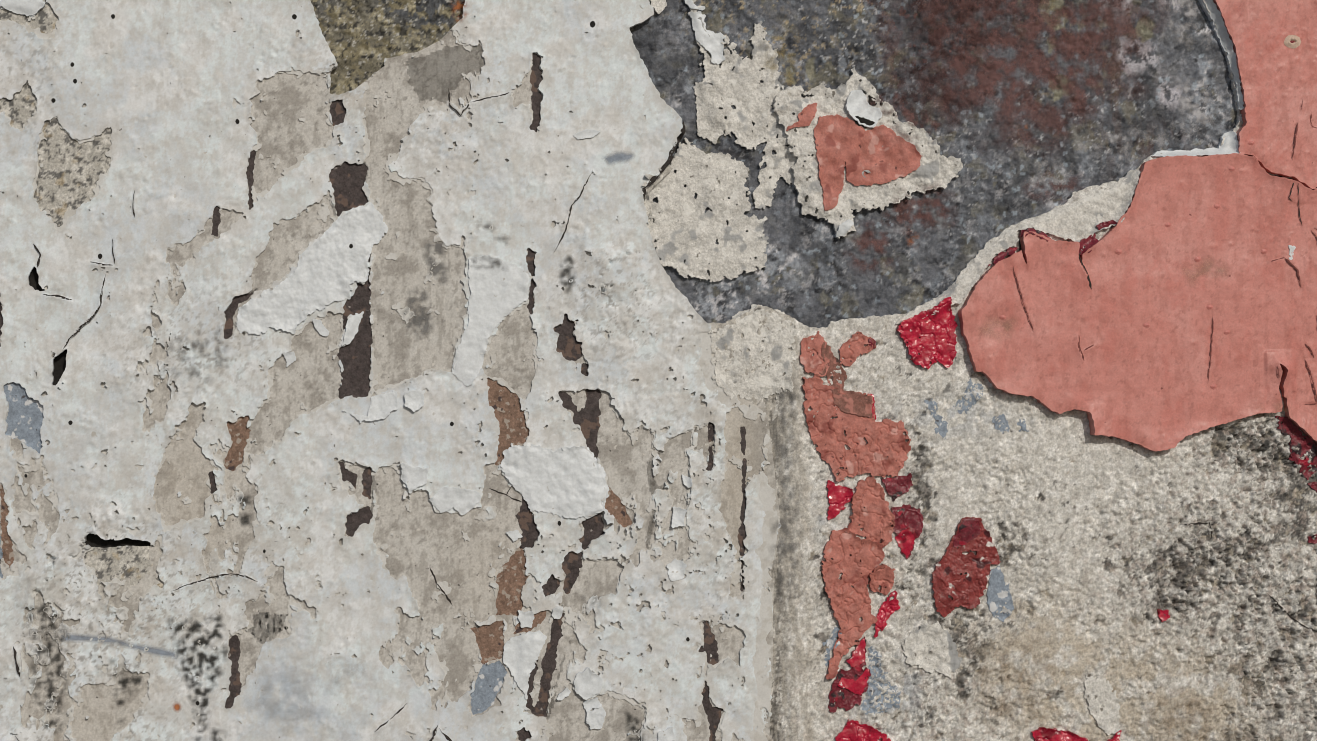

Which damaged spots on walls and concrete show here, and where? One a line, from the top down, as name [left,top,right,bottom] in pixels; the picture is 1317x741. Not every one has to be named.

spalling [0,0,58,33]
spalling [0,81,112,227]
crack [1267,99,1317,239]
crack [1271,257,1301,286]
peeling [136,0,769,741]
spalling [630,0,1244,741]
crack [1277,344,1317,405]
peeling [0,382,70,580]
peeling [1275,416,1317,492]
spalling [84,540,164,632]
peeling [20,591,150,741]